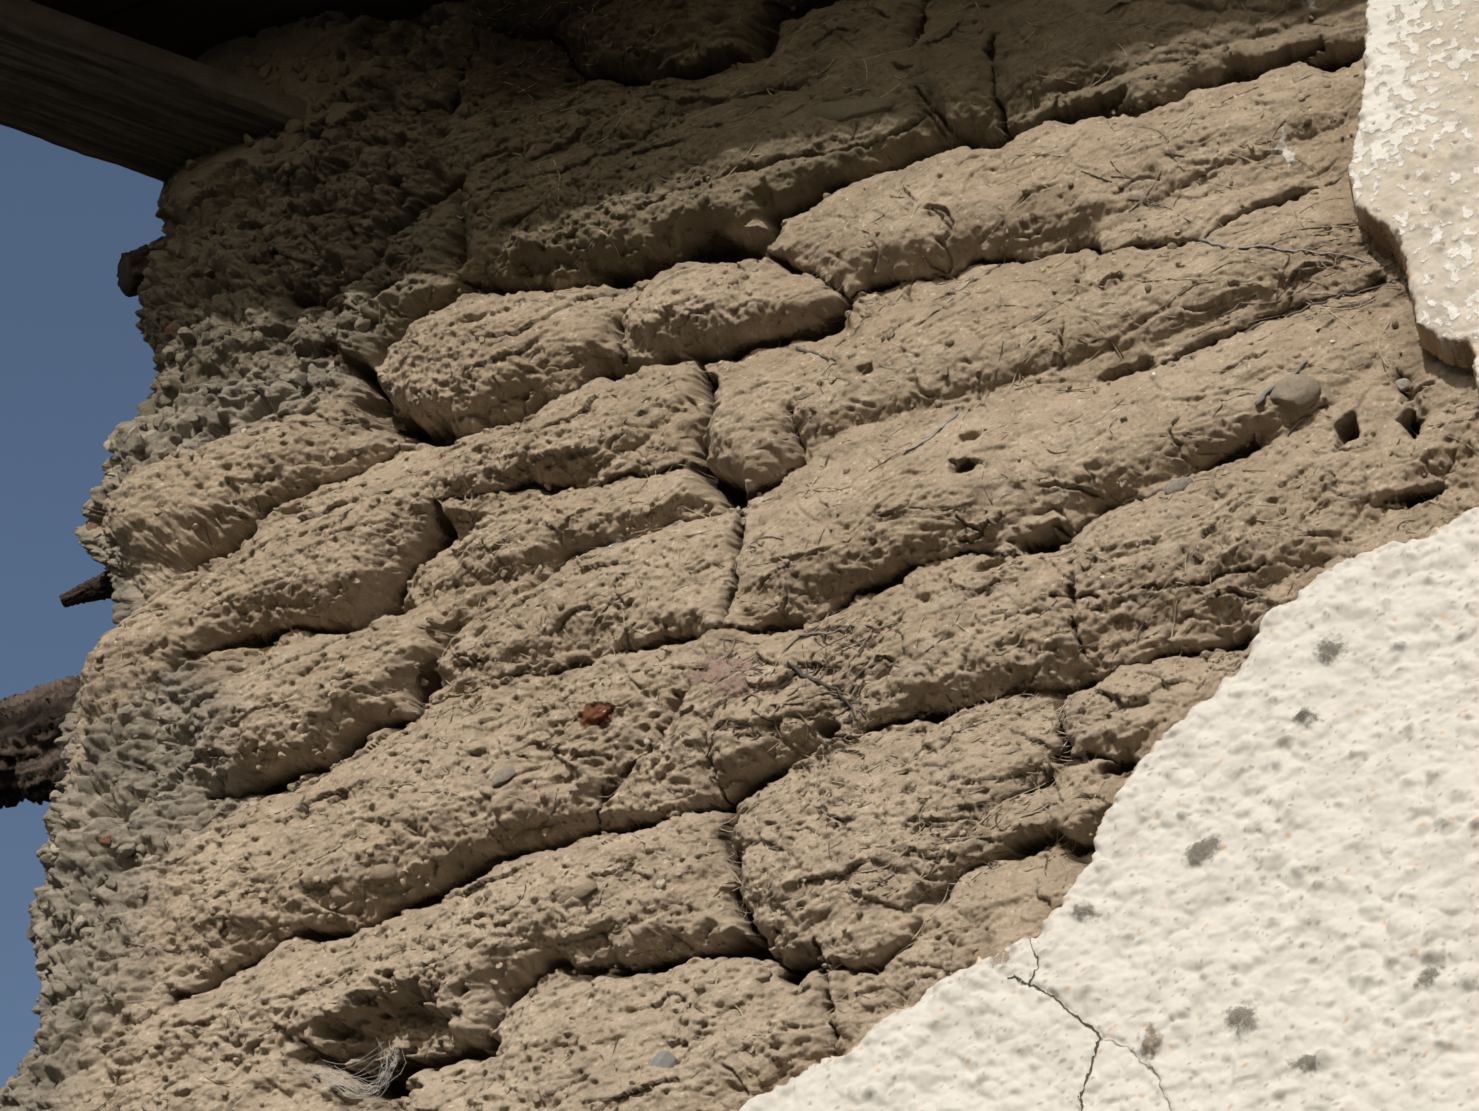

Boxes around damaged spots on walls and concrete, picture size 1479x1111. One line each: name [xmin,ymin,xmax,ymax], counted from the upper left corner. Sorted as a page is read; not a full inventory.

peeling [1348,0,1479,395]
crack [320,343,458,447]
crack [403,184,1027,678]
crack [1209,433,1261,471]
crack [183,624,347,661]
crack [209,659,443,800]
crack [836,562,1277,799]
crack [286,928,352,942]
crack [393,852,532,918]
crack [551,712,840,1054]
crack [295,1015,506,1096]
crack [1007,939,1172,1111]